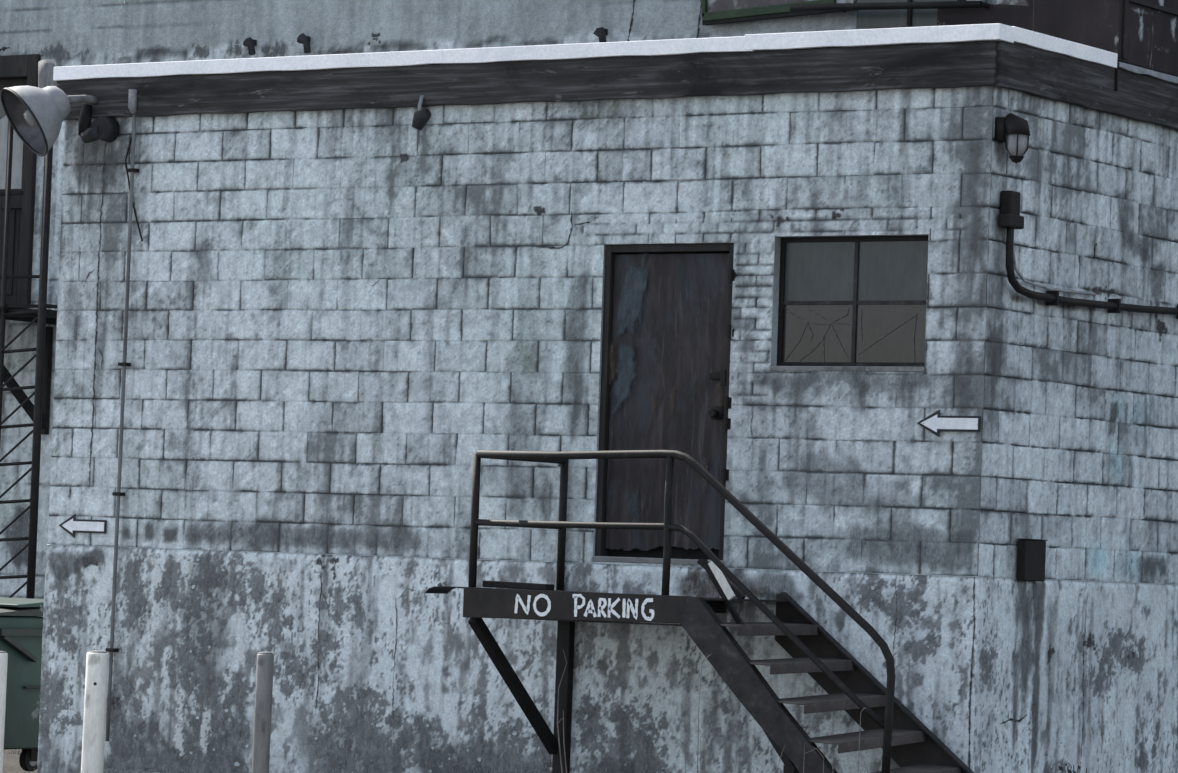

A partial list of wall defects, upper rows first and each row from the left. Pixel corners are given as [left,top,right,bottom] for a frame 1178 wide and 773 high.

crack [538,212,597,249]
water stain [1118,195,1164,306]
peeling [32,587,85,737]
peeling [103,550,552,773]
peeling [849,567,941,668]
peeling [970,634,999,696]
peeling [1082,621,1148,704]
peeling [1135,737,1157,773]